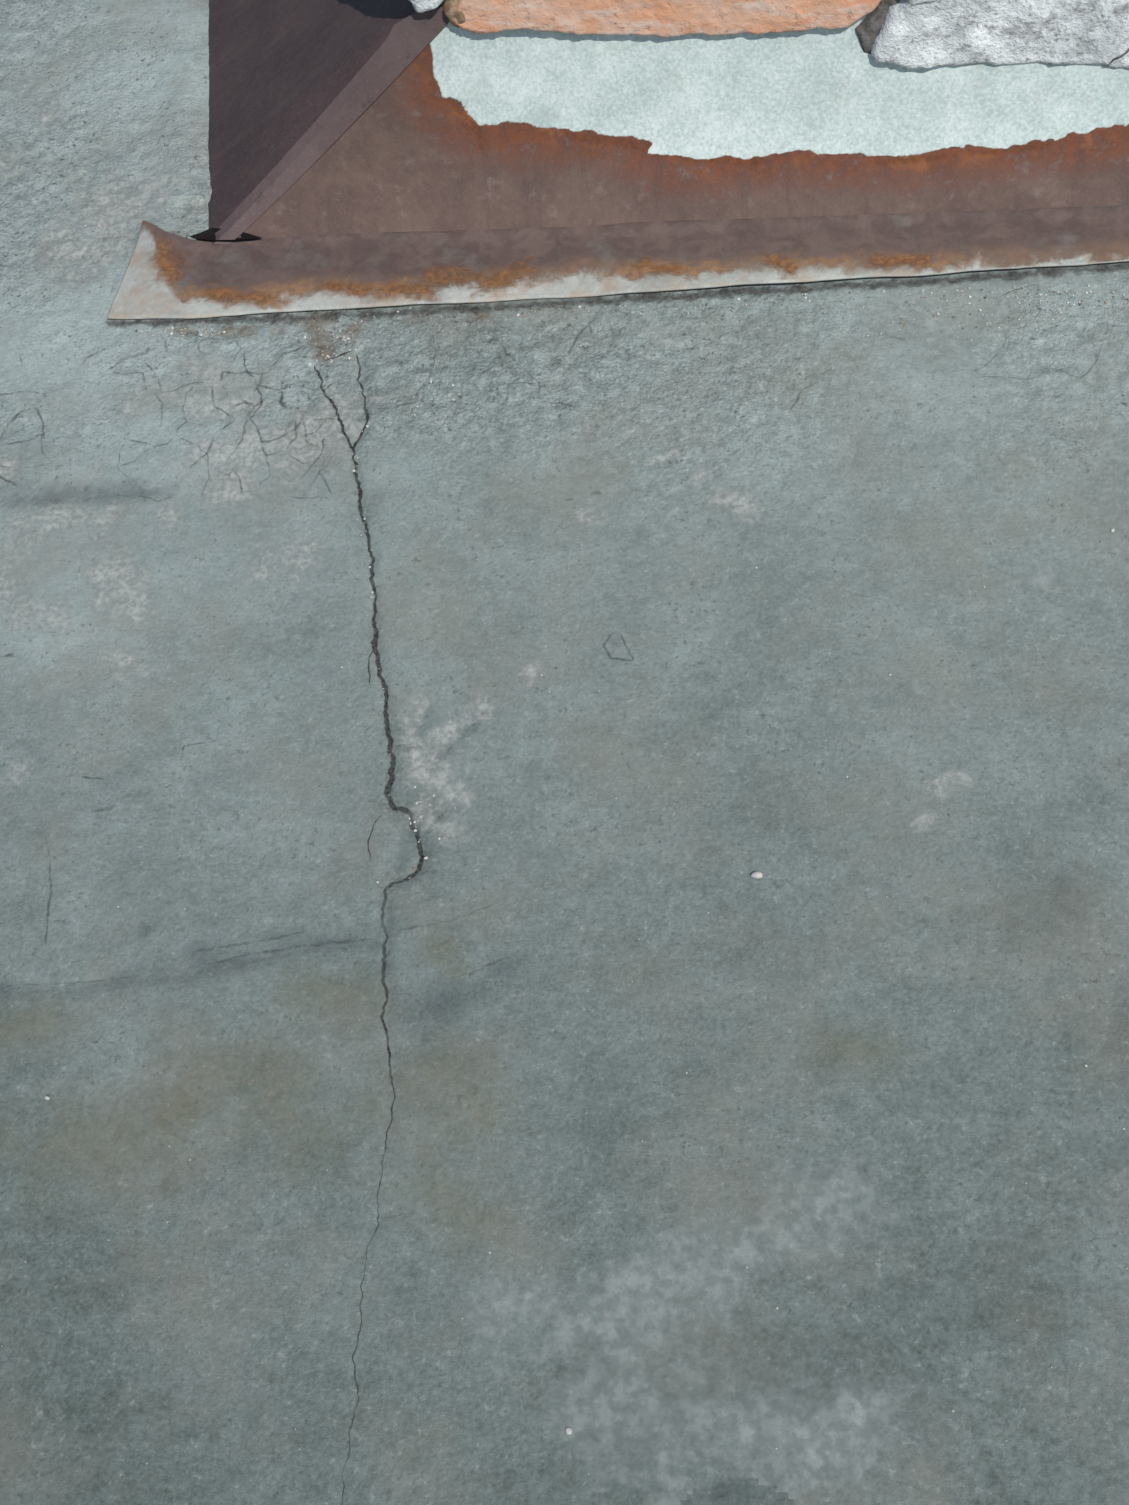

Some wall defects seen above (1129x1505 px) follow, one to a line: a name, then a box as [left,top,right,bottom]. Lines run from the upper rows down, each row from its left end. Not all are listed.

spalling [443,0,900,54]
corrosion [141,44,1129,308]
crack [212,362,284,426]
crack [298,348,441,1495]